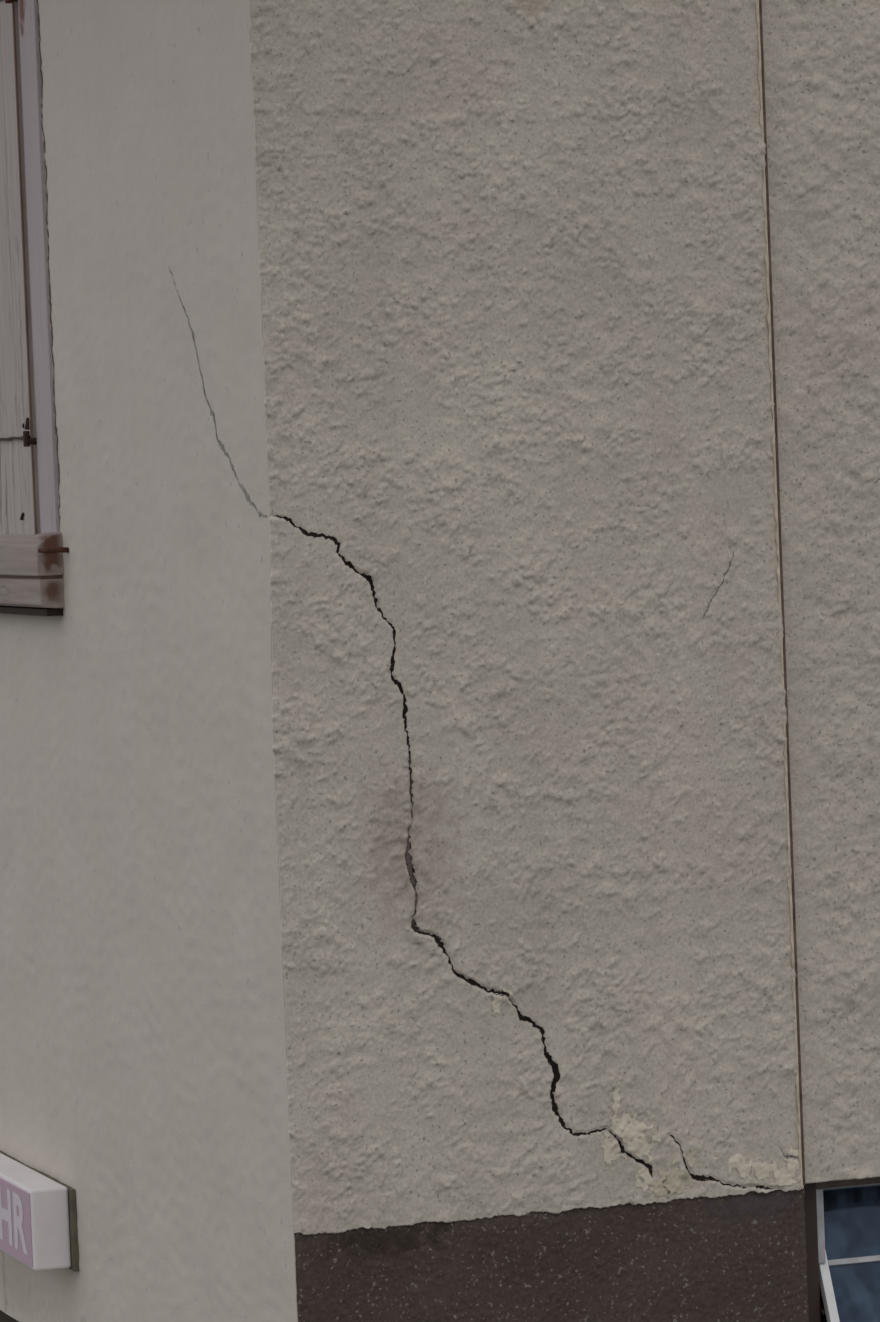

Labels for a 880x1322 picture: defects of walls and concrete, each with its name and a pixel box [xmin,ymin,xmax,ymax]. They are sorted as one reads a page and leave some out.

crack [703,551,735,618]
crack [168,265,653,1177]
crack [670,1135,781,1191]